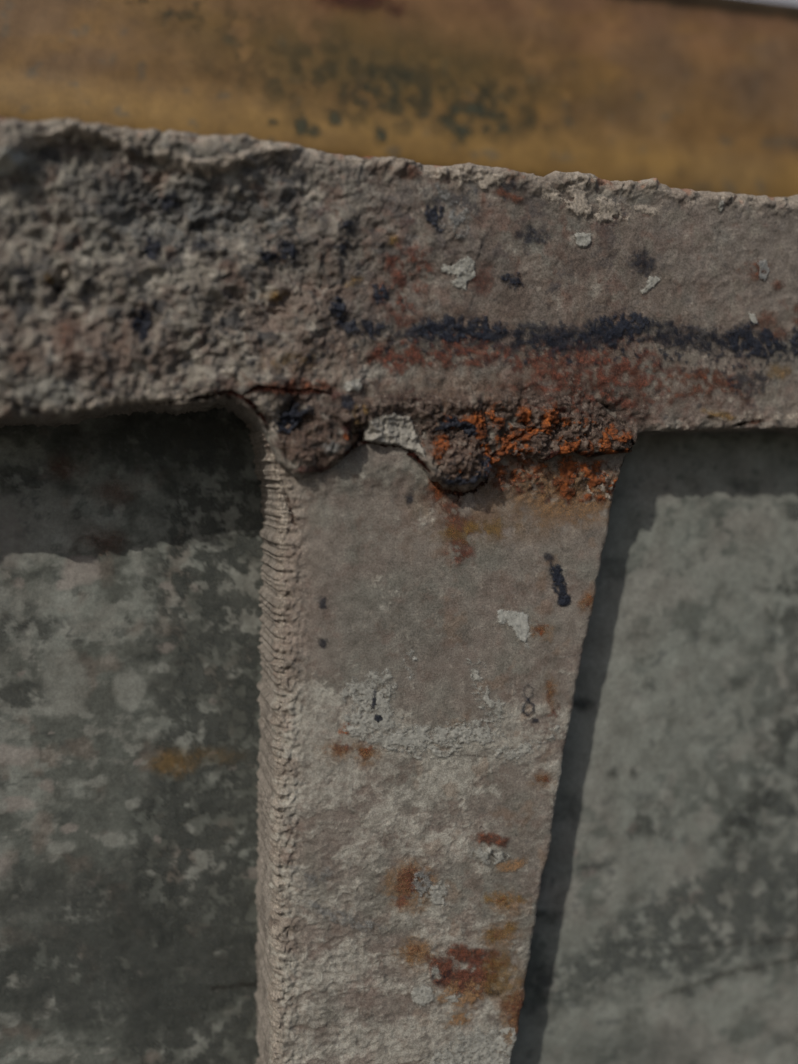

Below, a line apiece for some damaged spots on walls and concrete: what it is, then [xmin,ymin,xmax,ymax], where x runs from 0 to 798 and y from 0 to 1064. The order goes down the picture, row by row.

crack [127,372,328,425]
rust [255,339,742,562]
damp [544,553,571,606]
damp [0,408,264,1064]
rust [387,861,433,909]
rust [471,832,523,871]
damp [531,781,798,1007]
rust [406,922,524,1037]